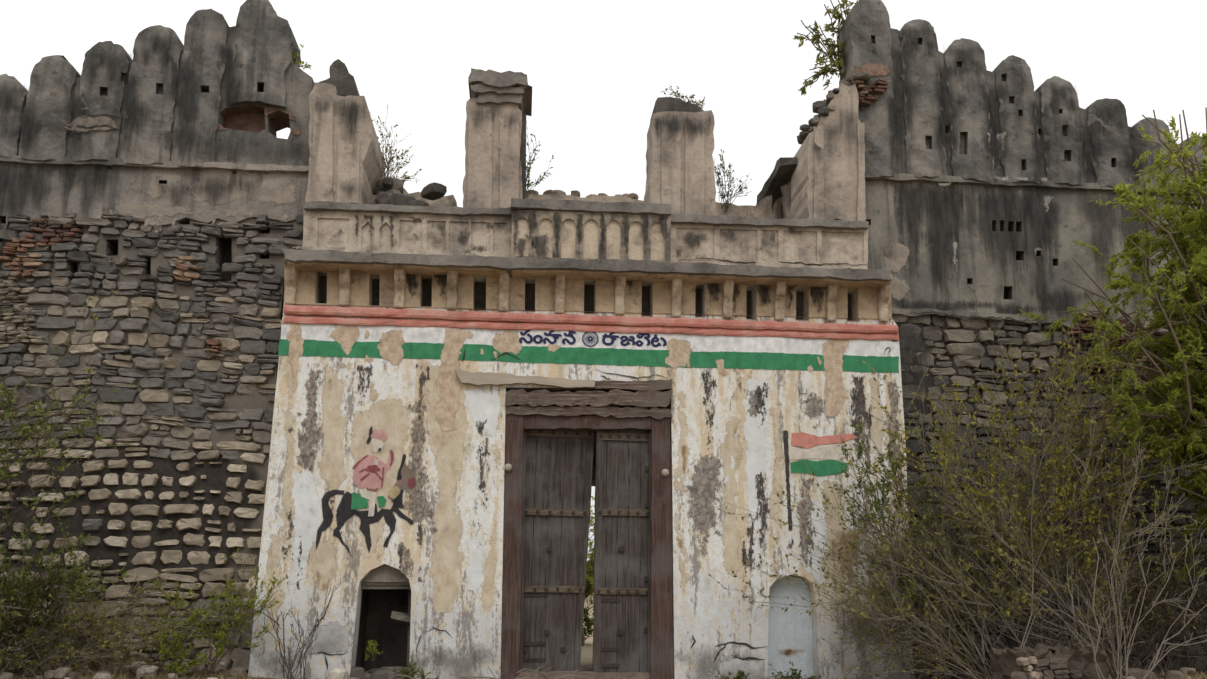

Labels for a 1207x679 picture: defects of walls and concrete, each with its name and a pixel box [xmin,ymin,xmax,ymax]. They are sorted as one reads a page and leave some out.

leakage [71,52,142,149]
leakage [144,36,297,155]
leakage [0,167,107,230]
leakage [513,211,561,257]
leakage [623,215,668,254]
leakage [896,86,1150,316]
peeling [246,320,522,652]
peeling [665,338,843,624]
peeling [802,339,902,534]